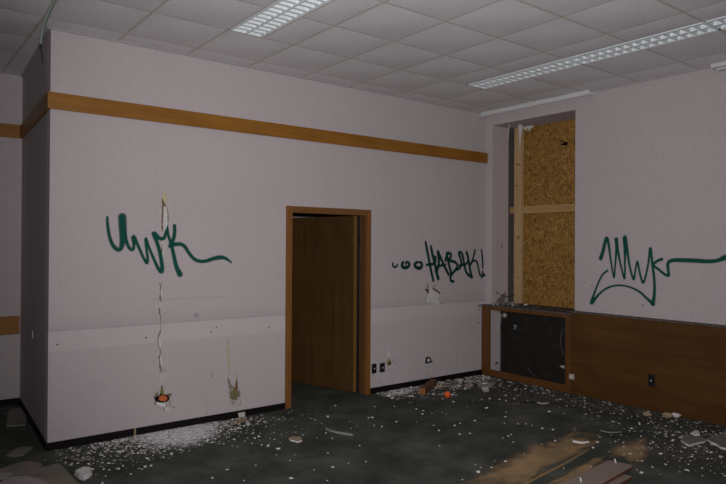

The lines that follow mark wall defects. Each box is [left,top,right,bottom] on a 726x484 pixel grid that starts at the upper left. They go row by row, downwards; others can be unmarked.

crack [157,282,167,386]
spalling [154,386,175,413]
spalling [227,377,242,405]